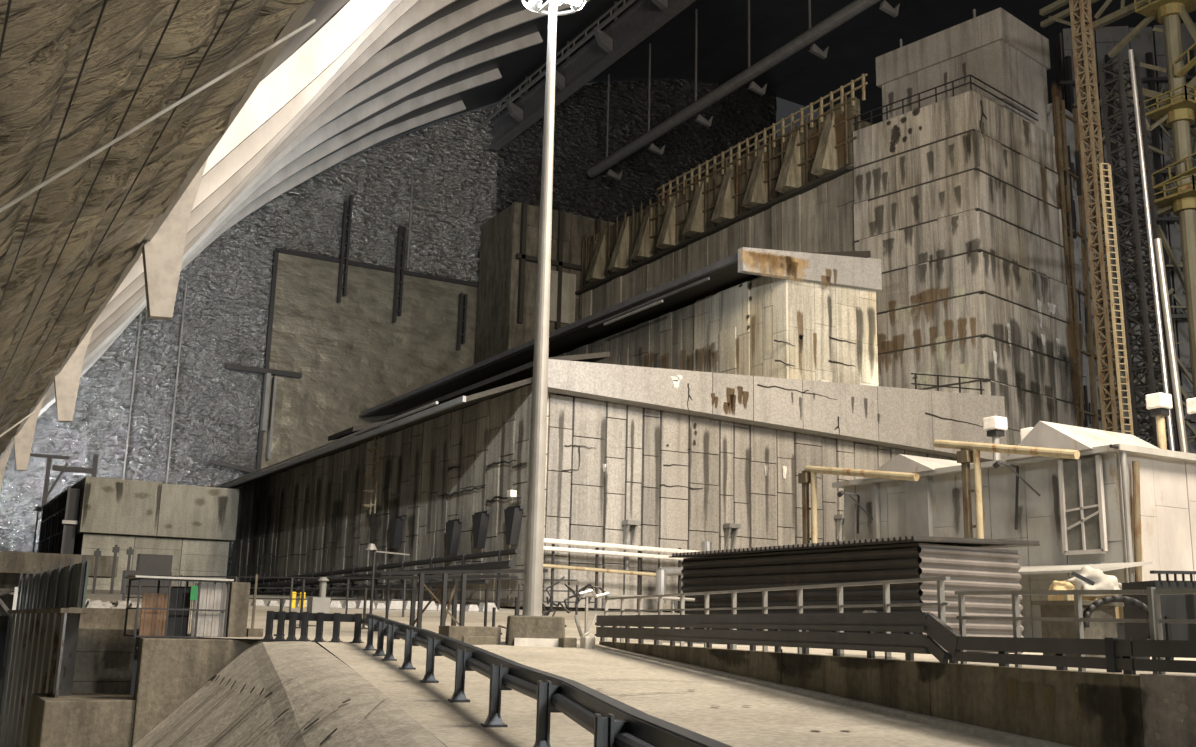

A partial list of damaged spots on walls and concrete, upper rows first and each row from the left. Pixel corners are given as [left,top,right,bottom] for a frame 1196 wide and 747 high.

water stain [949,121,985,159]
water stain [856,157,905,195]
water stain [869,196,919,250]
water stain [940,186,961,233]
rust [744,251,807,278]
rust [821,269,837,287]
water stain [856,309,875,367]
rust [877,288,976,372]
water stain [983,249,1077,420]
water stain [916,336,948,388]
rust [711,386,749,414]